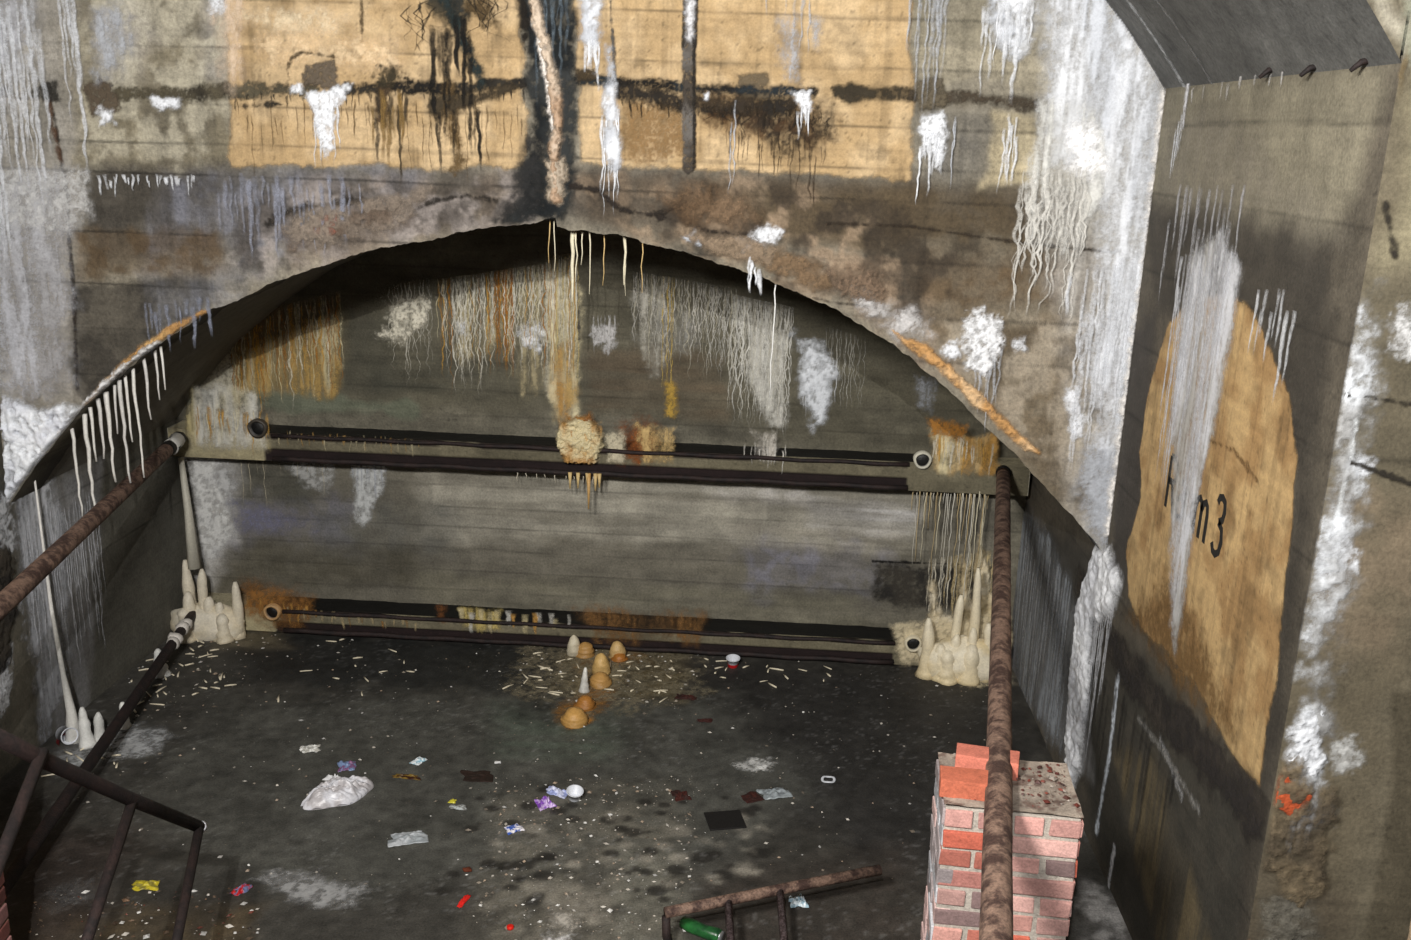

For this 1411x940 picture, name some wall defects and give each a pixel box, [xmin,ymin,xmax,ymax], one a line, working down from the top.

leakage [0,0,194,394]
leakage [351,465,386,525]
leakage [378,268,548,396]
leakage [437,606,569,630]
leakage [211,0,829,223]
leakage [631,260,866,470]
leakage [753,227,784,244]
leakage [831,0,1192,542]
leakage [1160,188,1244,647]
leakage [1249,294,1293,389]
efflorescence [1286,335,1374,831]
efflorescence [1389,306,1411,361]